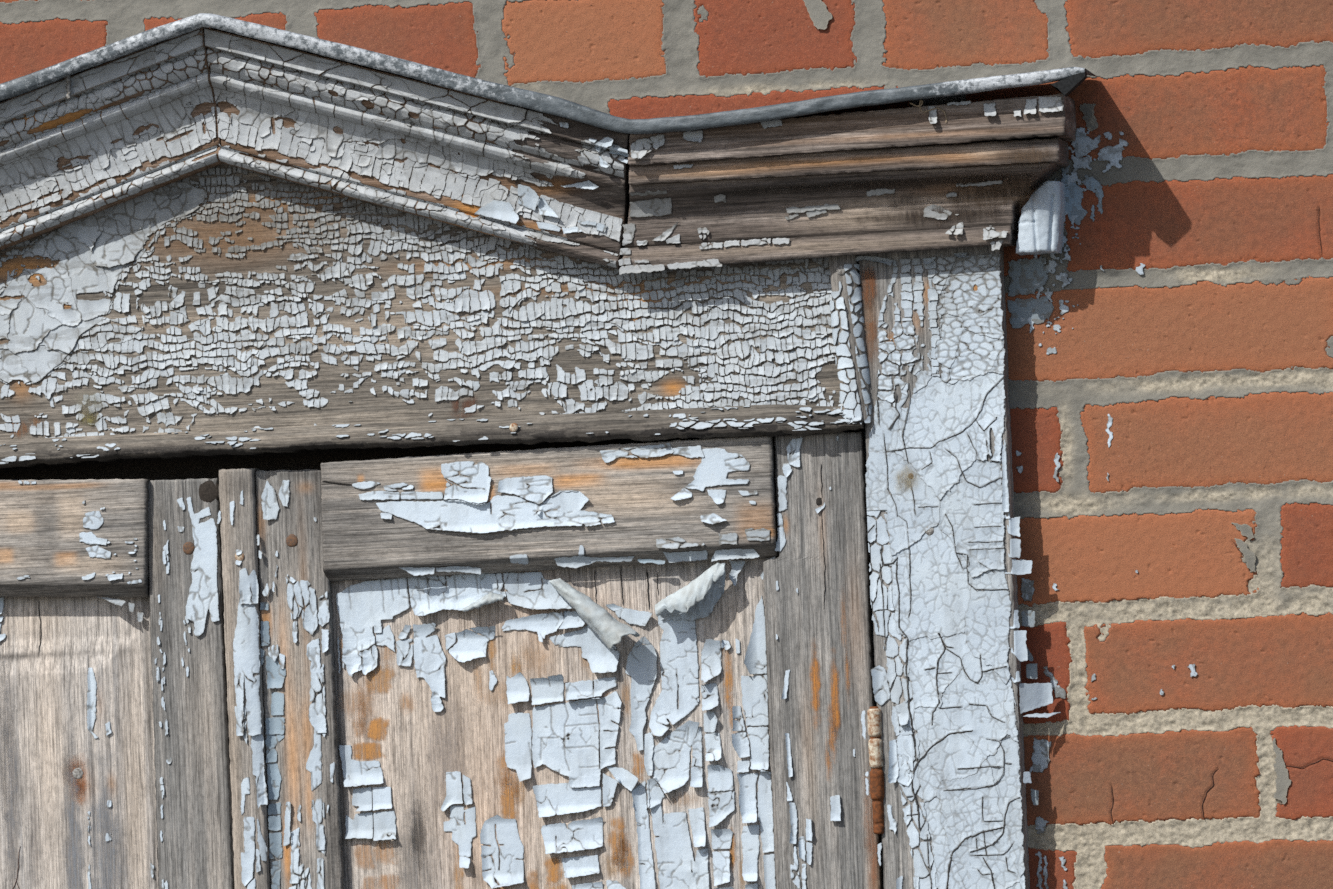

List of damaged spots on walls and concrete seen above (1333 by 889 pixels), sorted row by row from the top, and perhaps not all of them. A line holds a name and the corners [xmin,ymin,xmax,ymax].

peeling [0,29,1064,889]
crack [866,379,1018,889]